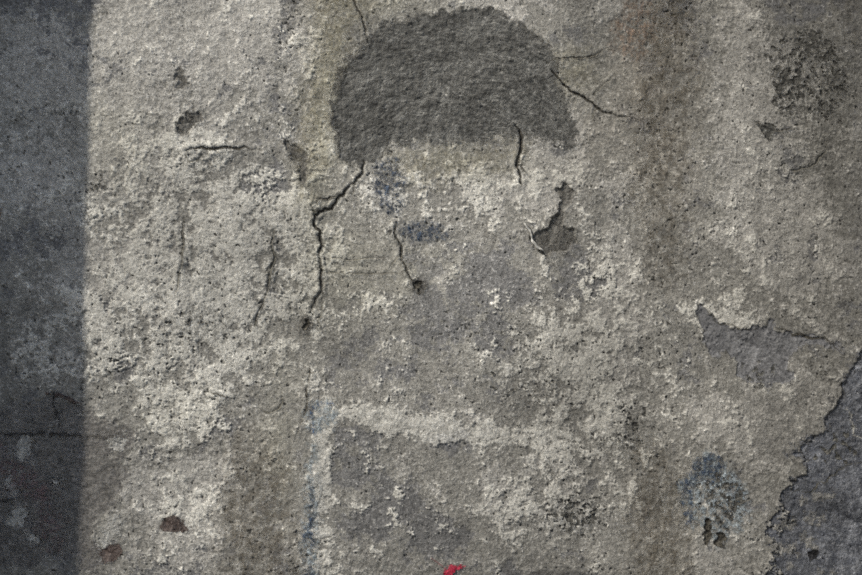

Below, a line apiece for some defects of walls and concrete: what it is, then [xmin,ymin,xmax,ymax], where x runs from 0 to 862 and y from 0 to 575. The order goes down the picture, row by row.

crack [551,47,627,118]
crack [515,126,527,185]
crack [310,162,416,327]
peeling [696,296,845,392]
spalling [696,472,751,548]
spalling [760,350,862,575]